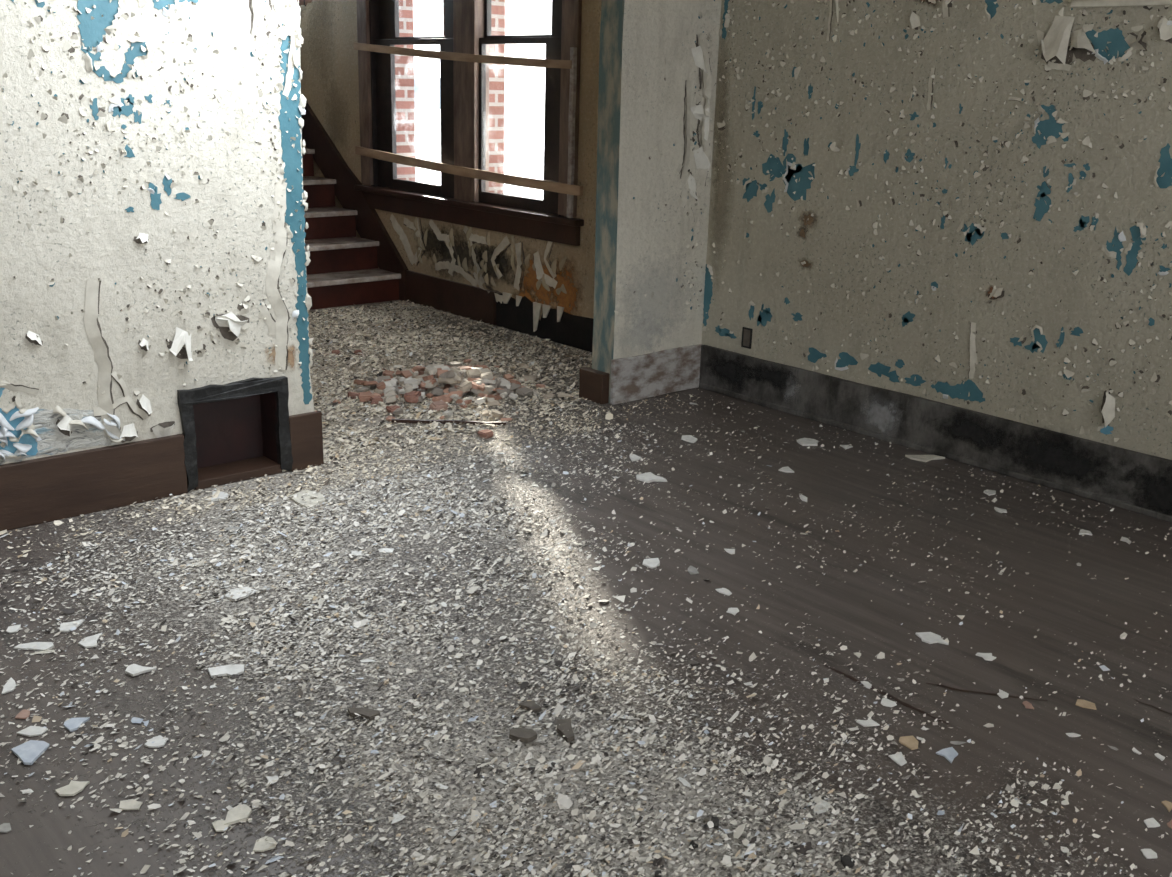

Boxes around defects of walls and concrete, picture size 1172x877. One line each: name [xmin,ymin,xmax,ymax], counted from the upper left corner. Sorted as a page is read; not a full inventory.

peeling [0,0,221,215]
peeling [98,0,314,404]
flaking render [449,227,594,352]
crack [2,383,39,395]
peeling [0,380,125,465]
crack [84,279,148,437]
damp [707,356,796,396]
damp [864,401,898,433]
damp [935,412,1172,516]